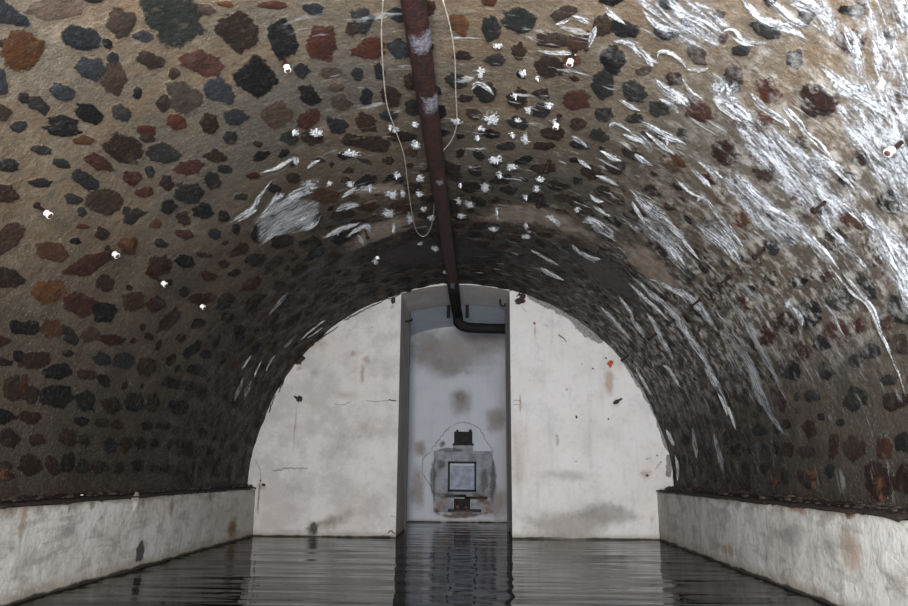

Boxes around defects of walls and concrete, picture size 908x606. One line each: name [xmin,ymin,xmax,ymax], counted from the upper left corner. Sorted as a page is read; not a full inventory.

damp [642,0,765,46]
damp [614,40,708,113]
damp [743,0,908,208]
damp [230,180,333,243]
damp [481,155,520,192]
damp [574,194,615,241]
damp [609,122,686,166]
damp [632,193,698,267]
damp [676,179,747,267]
damp [713,81,908,308]
damp [692,162,903,387]
damp [571,245,736,429]